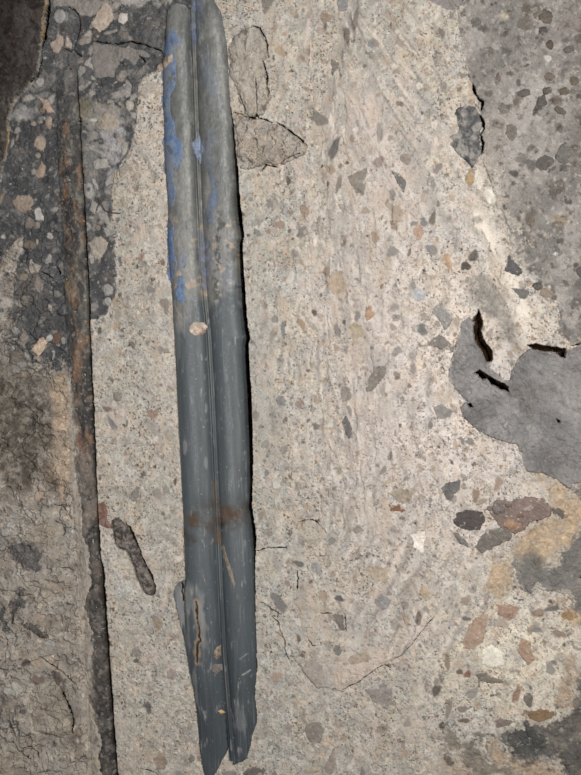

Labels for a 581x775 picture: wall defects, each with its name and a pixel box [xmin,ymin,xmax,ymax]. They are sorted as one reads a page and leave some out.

crack [233,26,305,169]
spalling [0,0,203,380]
spalling [448,0,581,501]
spalling [189,322,207,336]
crack [237,167,287,554]
corrosion [98,502,113,529]
peeling [513,530,581,614]
crack [342,618,433,690]